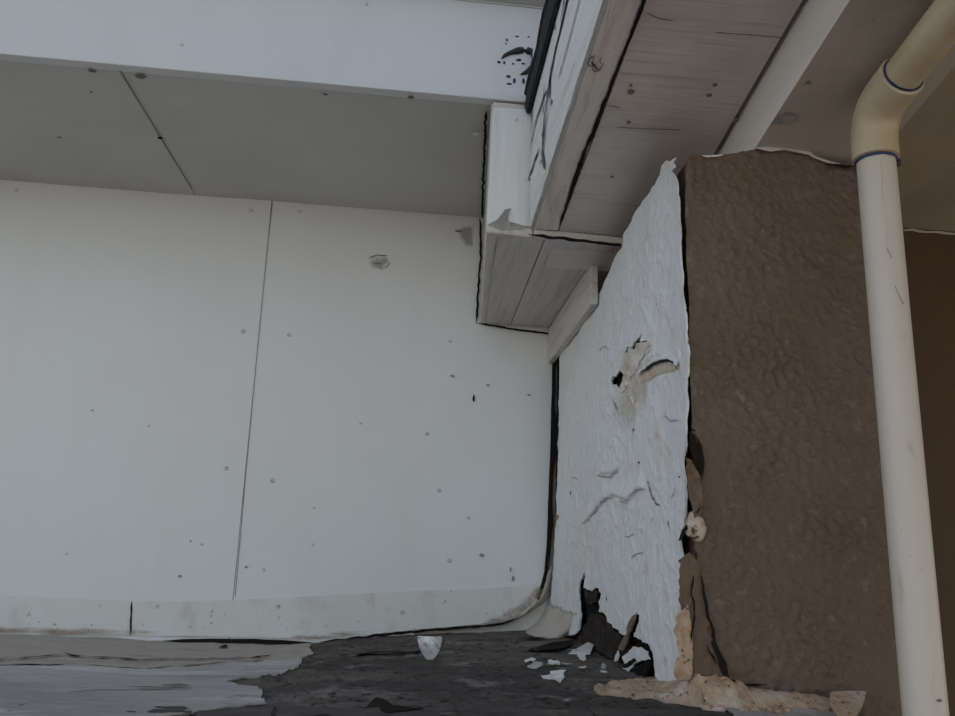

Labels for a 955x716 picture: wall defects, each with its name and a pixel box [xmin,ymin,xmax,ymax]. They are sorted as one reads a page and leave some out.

crack [714,31,783,39]
crack [529,0,678,246]
peeling [637,354,678,382]
flaking render [678,458,707,542]
peeling [0,634,314,716]
peeling [524,575,607,683]
spalling [594,552,837,716]